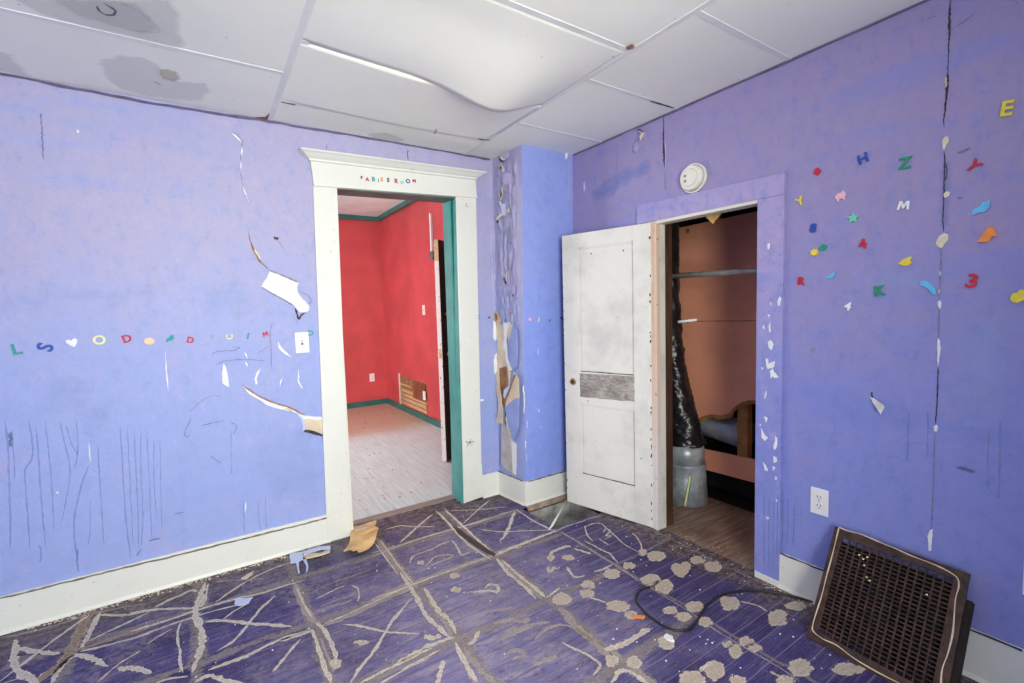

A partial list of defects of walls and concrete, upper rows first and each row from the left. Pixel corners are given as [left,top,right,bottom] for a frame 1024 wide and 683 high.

peeling [496,152,511,223]
peeling [261,270,312,326]
crack [568,0,975,551]
peeling [762,296,781,378]
peeling [242,353,323,437]
peeling [760,416,777,480]